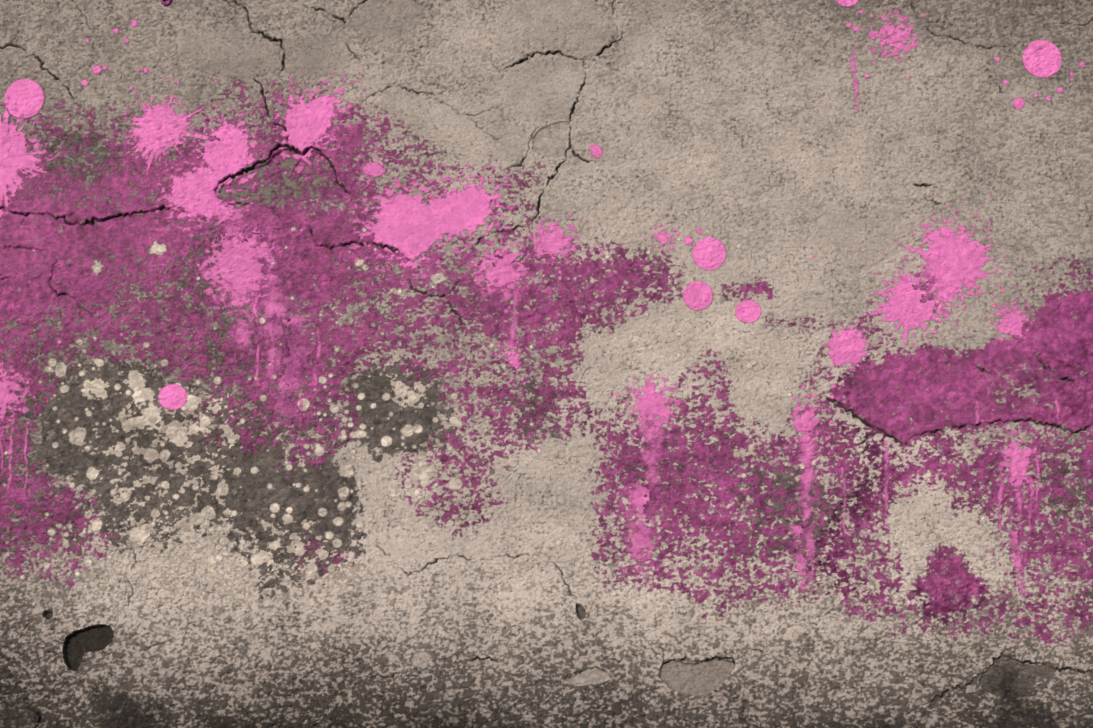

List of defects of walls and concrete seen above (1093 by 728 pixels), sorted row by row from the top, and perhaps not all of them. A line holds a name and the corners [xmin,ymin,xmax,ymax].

crack [226,1,285,68]
crack [0,38,73,98]
crack [215,80,351,206]
crack [477,40,620,264]
crack [0,206,169,225]
crack [310,228,463,323]
peeling [0,80,1093,646]
crack [827,398,1090,446]
spalling [61,622,116,673]
spalling [407,649,434,670]
spalling [563,665,615,690]
spalling [657,656,738,700]